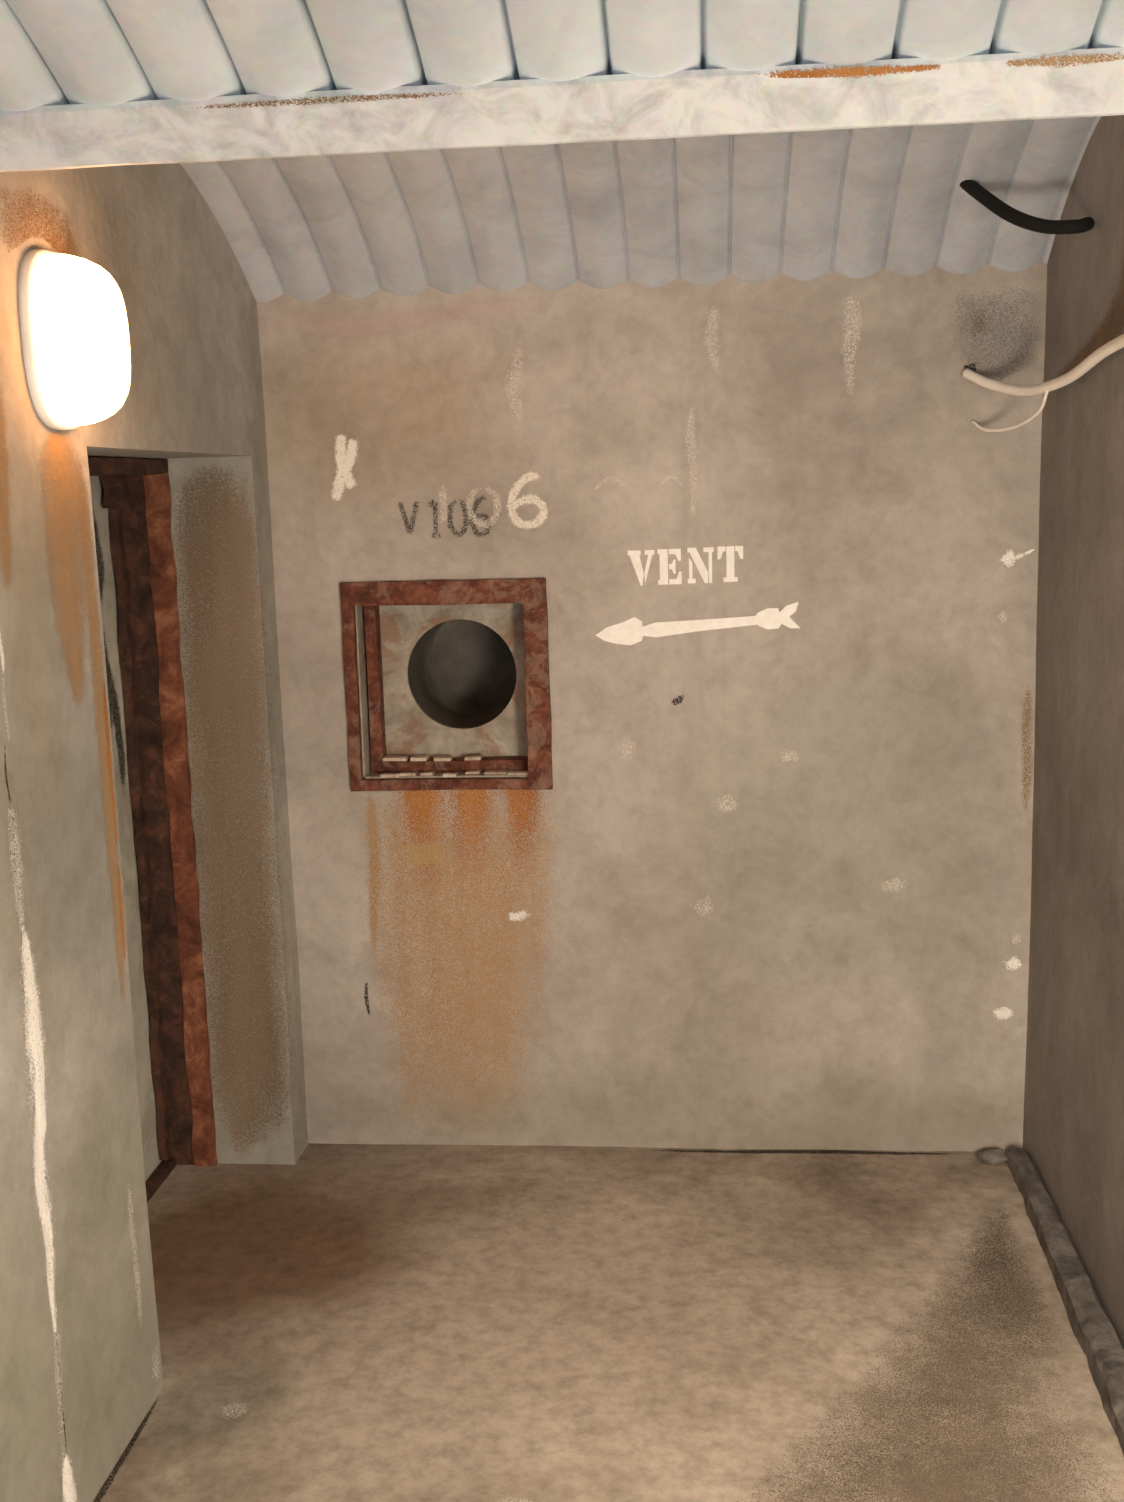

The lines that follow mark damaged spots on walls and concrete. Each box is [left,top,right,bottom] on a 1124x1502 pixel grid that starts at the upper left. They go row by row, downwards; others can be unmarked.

corrosion [197,92,461,109]
corrosion [758,64,941,79]
corrosion [1003,52,1124,68]
corrosion [0,185,85,257]
corrosion [0,372,14,594]
corrosion [37,430,126,1008]
corrosion [347,754,569,1144]
water stain [6,804,78,1502]